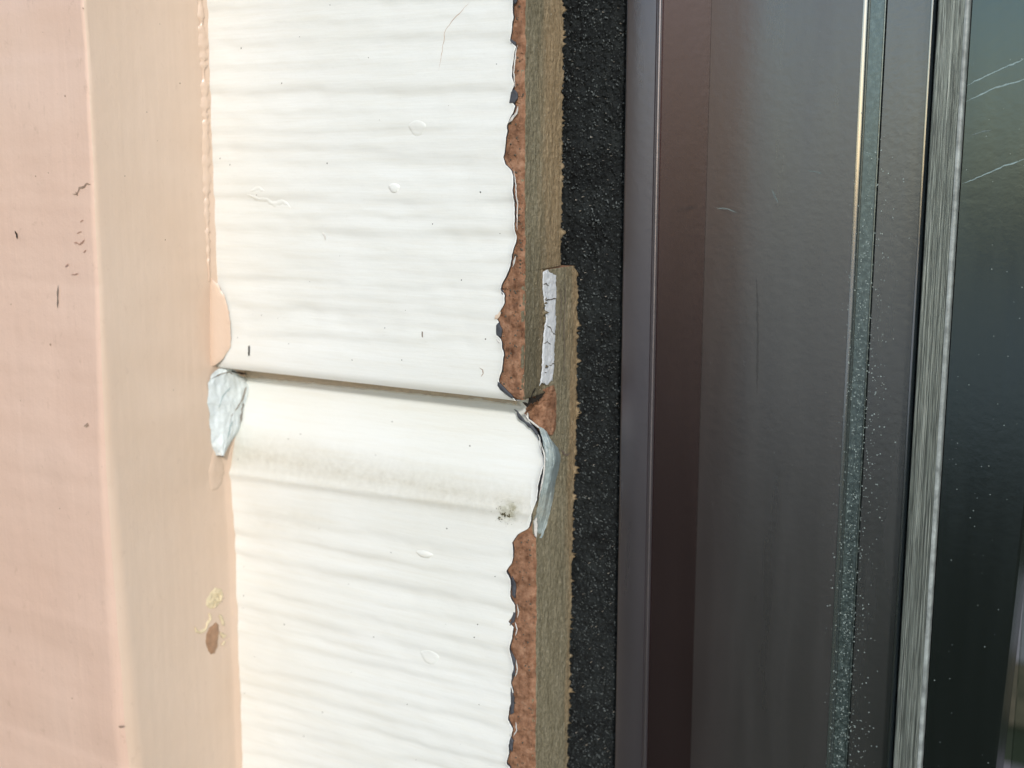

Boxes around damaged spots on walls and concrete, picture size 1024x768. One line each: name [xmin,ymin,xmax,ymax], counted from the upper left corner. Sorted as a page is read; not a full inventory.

spalling [494,0,561,768]